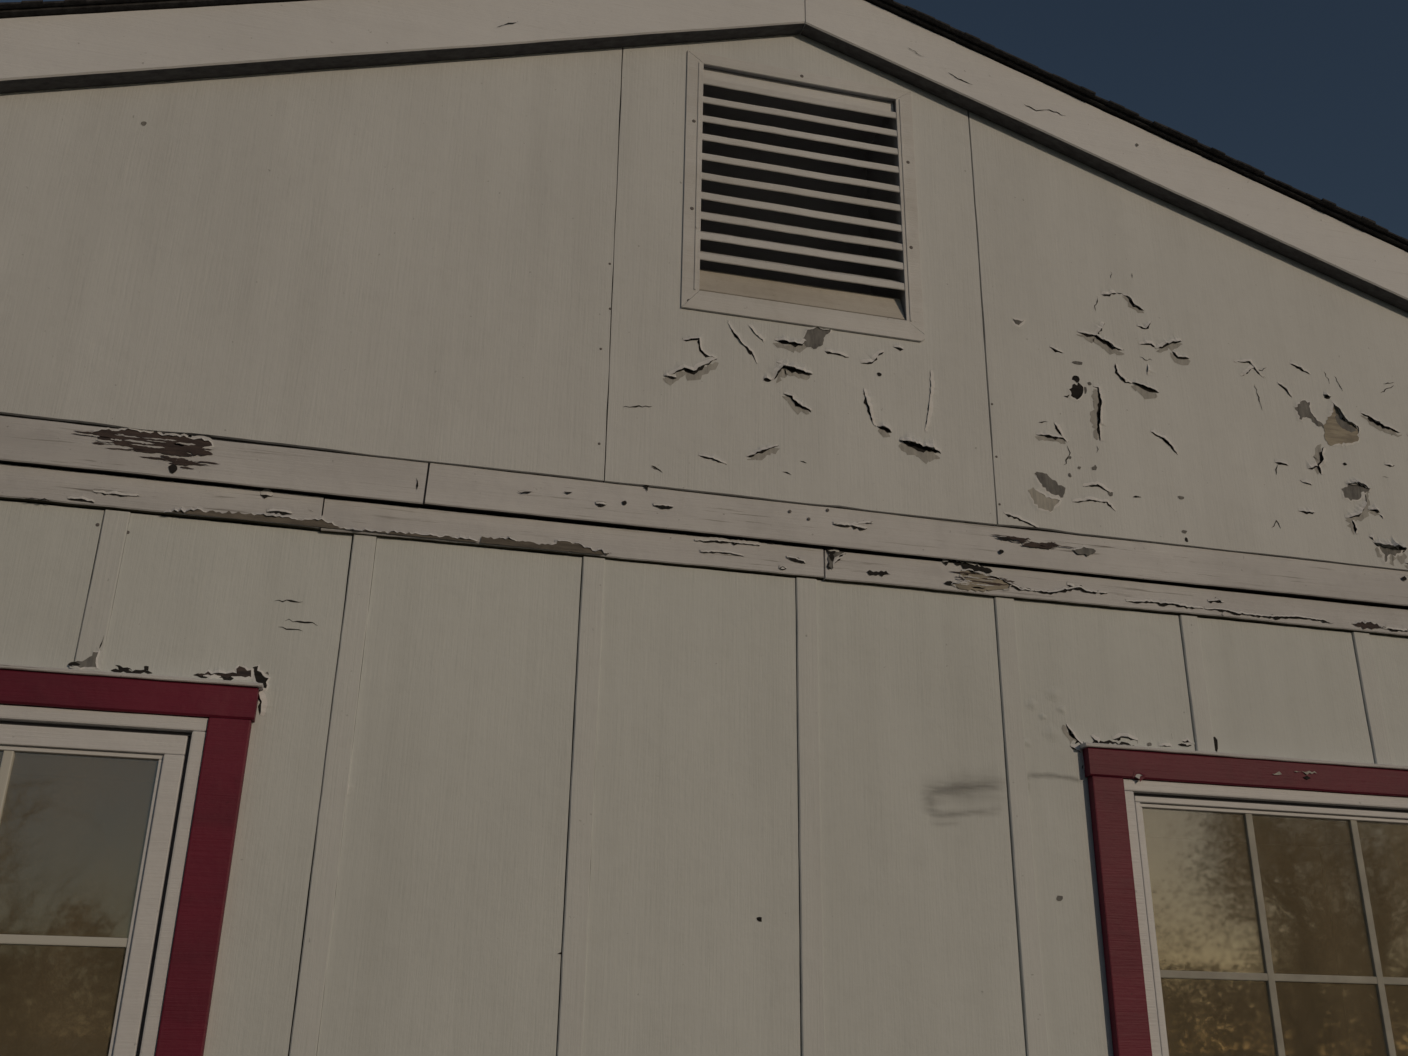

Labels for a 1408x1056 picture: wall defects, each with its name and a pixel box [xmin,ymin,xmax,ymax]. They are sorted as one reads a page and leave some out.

peeling [773,326,833,353]
peeling [1049,343,1091,402]
peeling [1293,389,1362,450]
peeling [71,427,218,473]
peeling [1028,472,1065,515]
peeling [161,506,610,555]
peeling [991,534,1096,556]
peeling [1342,476,1408,581]
peeling [942,559,1035,592]
peeling [1352,620,1408,632]
peeling [68,637,152,674]
peeling [194,662,277,717]